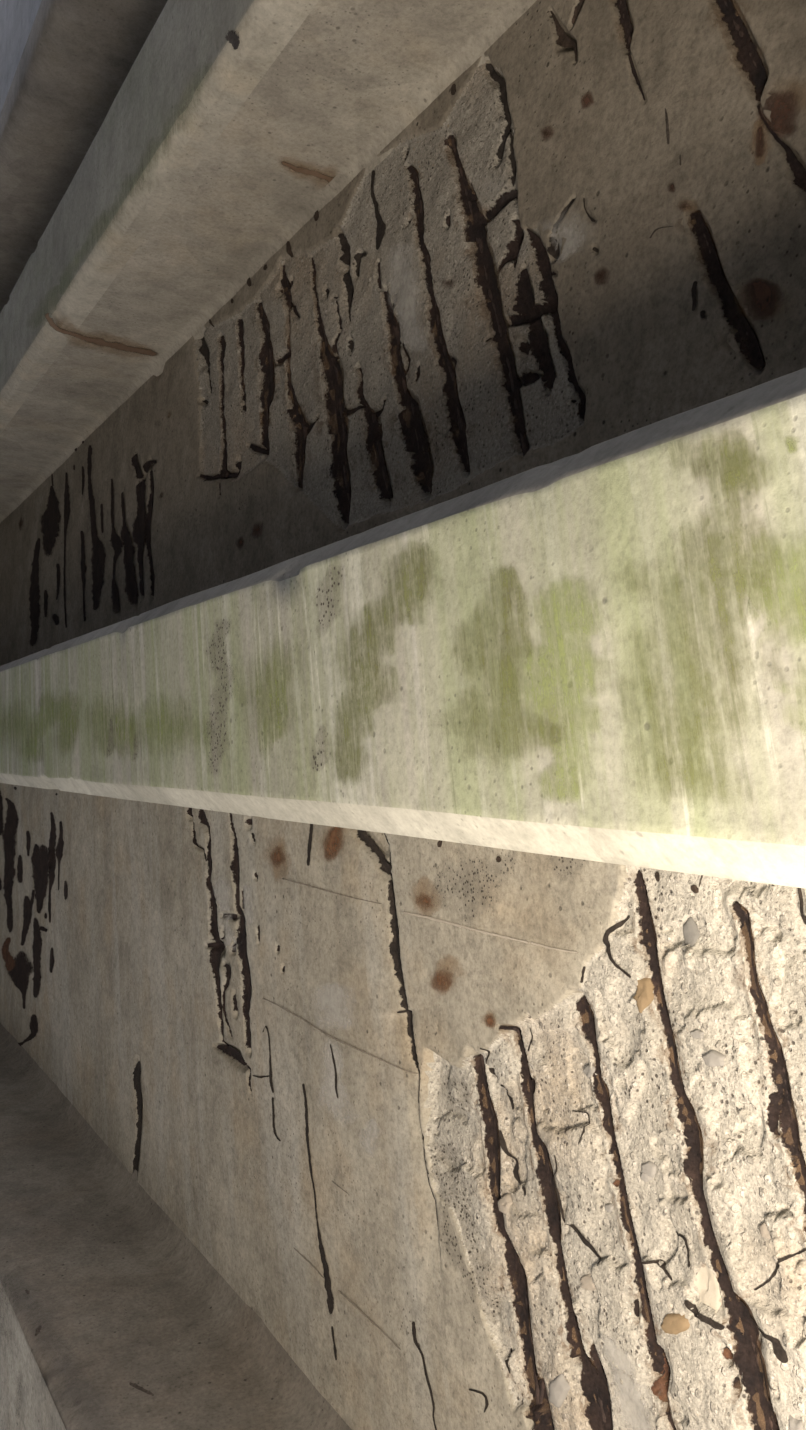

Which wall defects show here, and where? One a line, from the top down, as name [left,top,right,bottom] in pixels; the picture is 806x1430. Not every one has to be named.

corrosion [756,93,796,157]
corrosion [45,313,157,356]
spalling [194,61,586,530]
corrosion [323,827,341,858]
crack [357,830,438,1225]
corrosion [433,973,451,991]
crack [580,915,631,983]
crack [253,1026,338,1360]
crack [480,1048,601,1266]
spalling [424,865,806,1430]
peeling [0,1281,66,1430]
crack [641,1231,806,1390]